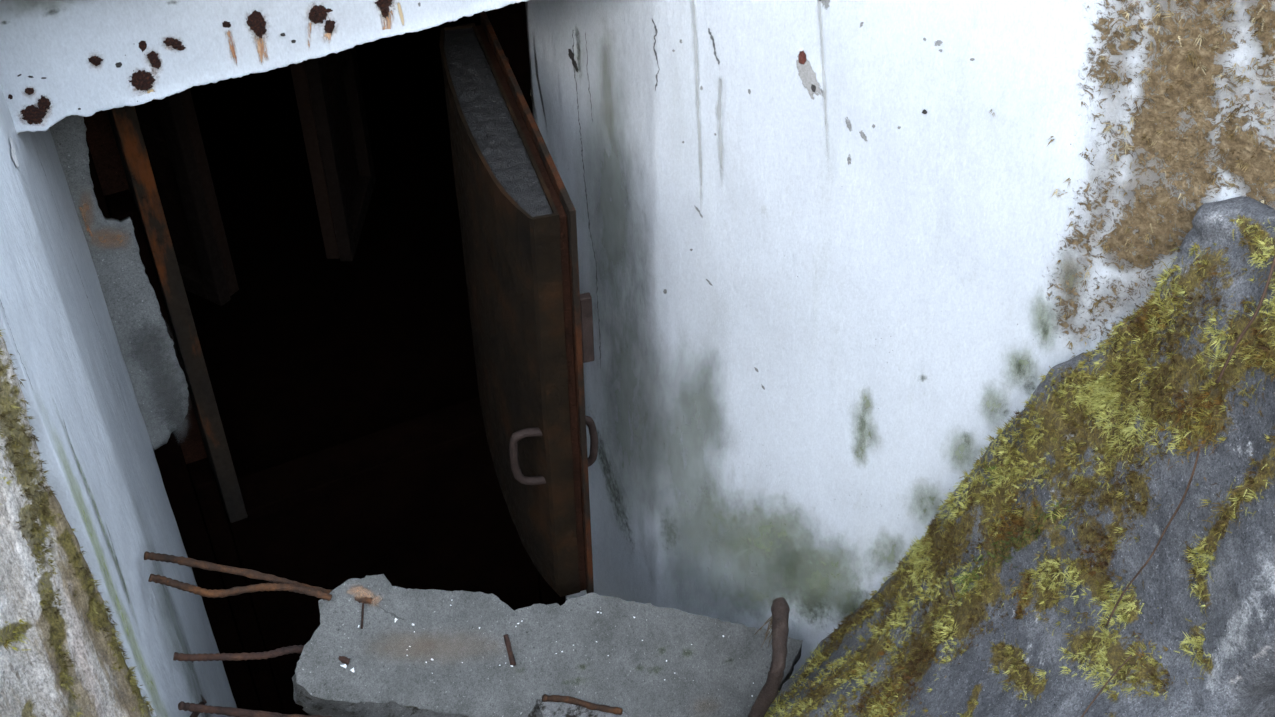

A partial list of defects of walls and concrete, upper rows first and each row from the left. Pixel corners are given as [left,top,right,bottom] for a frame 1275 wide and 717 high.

corrosion [88,37,186,93]
corrosion [222,21,237,64]
corrosion [246,5,336,63]
corrosion [375,0,404,30]
water stain [599,136,628,280]
water stain [610,334,714,527]
spalling [144,551,332,601]
water stain [681,521,840,601]
spalling [173,645,305,662]
spalling [178,672,470,717]
spalling [528,694,630,717]
spalling [777,644,802,696]